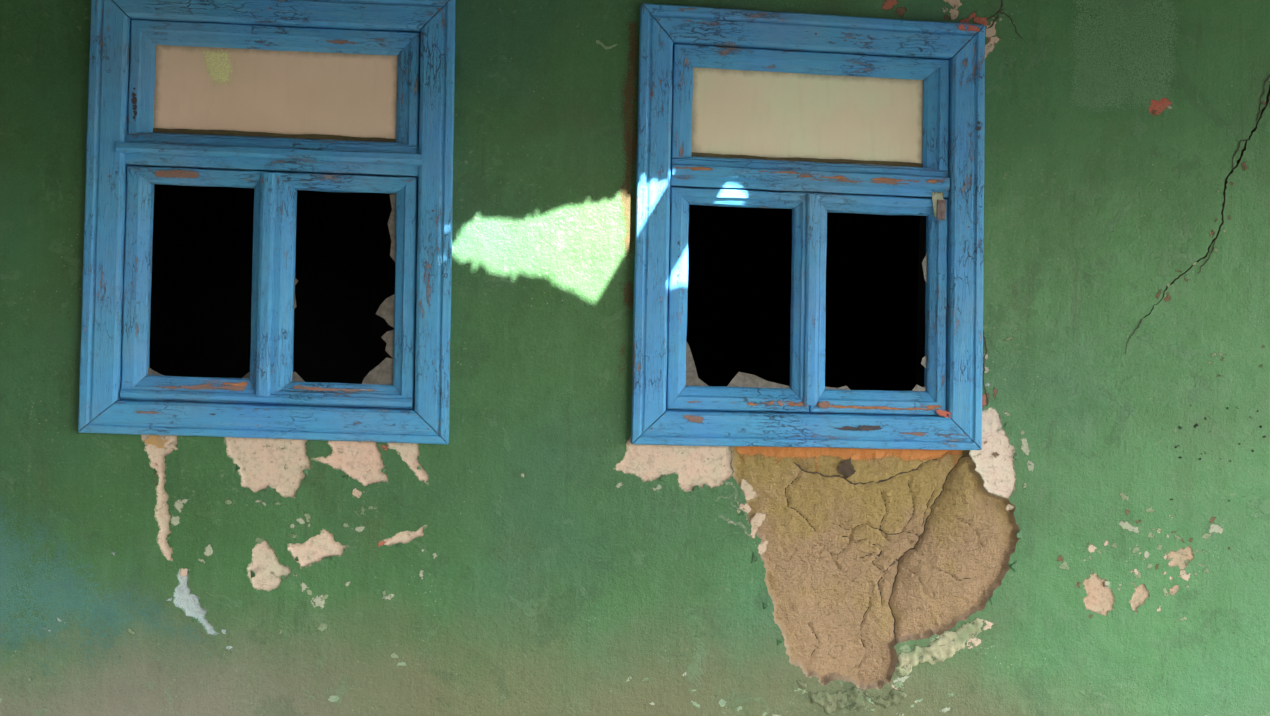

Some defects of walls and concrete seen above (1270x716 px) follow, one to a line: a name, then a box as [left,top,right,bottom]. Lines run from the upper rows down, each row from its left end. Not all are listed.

peeling [942,0,1004,59]
peeling [1148,97,1174,116]
crack [1125,74,1270,354]
peeling [141,435,233,650]
peeling [224,437,437,632]
flaking render [613,330,1035,716]
peeling [1057,493,1223,618]